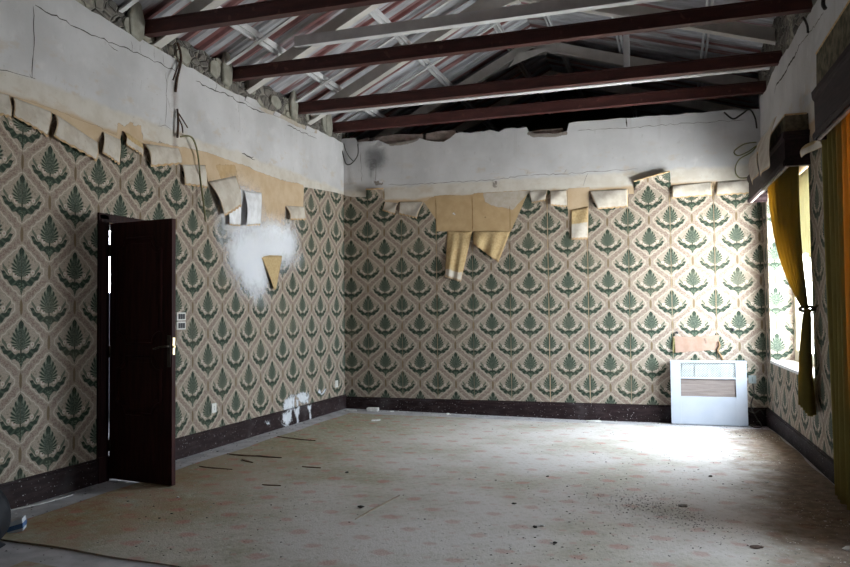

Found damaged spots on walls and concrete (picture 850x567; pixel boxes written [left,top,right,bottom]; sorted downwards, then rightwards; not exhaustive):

crack [2,5,175,128]
crack [197,81,264,113]
spalling [245,96,317,133]